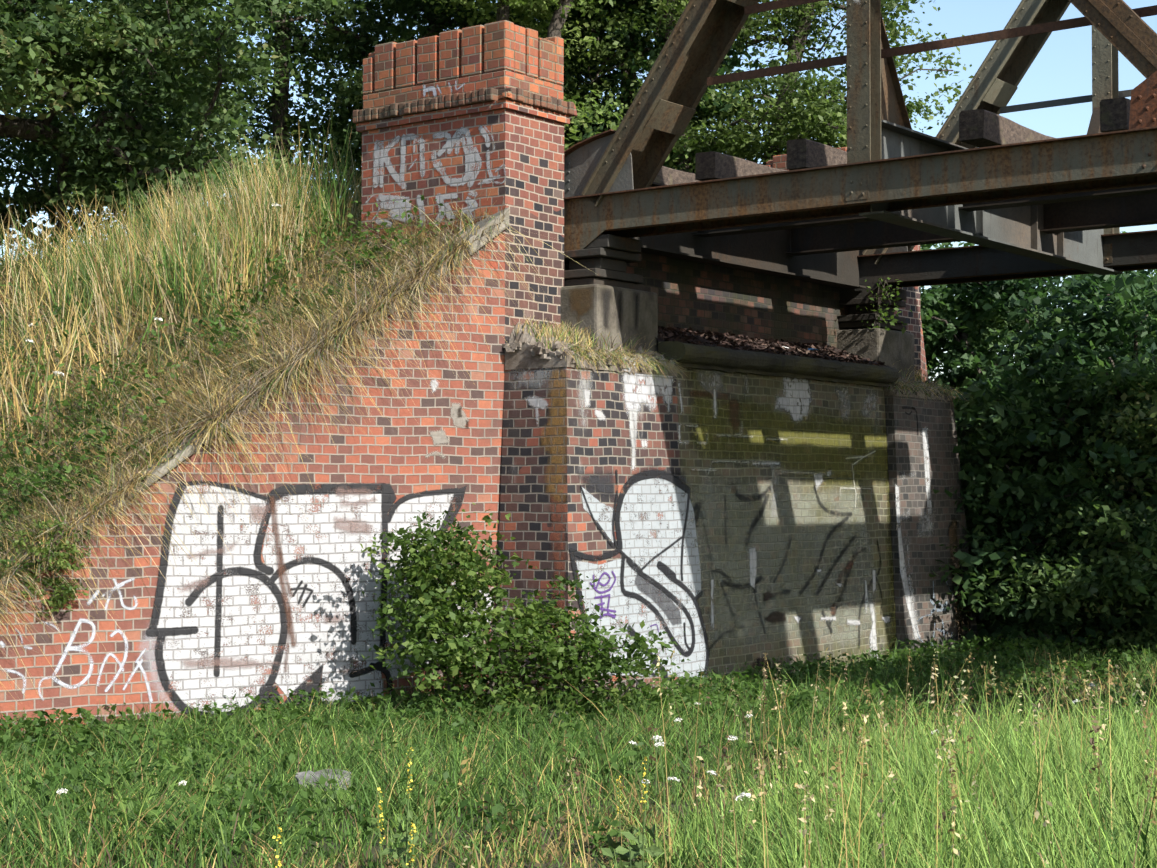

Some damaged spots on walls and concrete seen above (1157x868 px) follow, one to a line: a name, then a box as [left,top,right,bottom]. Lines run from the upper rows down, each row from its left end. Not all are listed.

spalling [502,322,677,376]
leakage [623,358,683,469]
leakage [700,372,721,418]
leakage [775,377,811,421]
leakage [749,548,757,587]